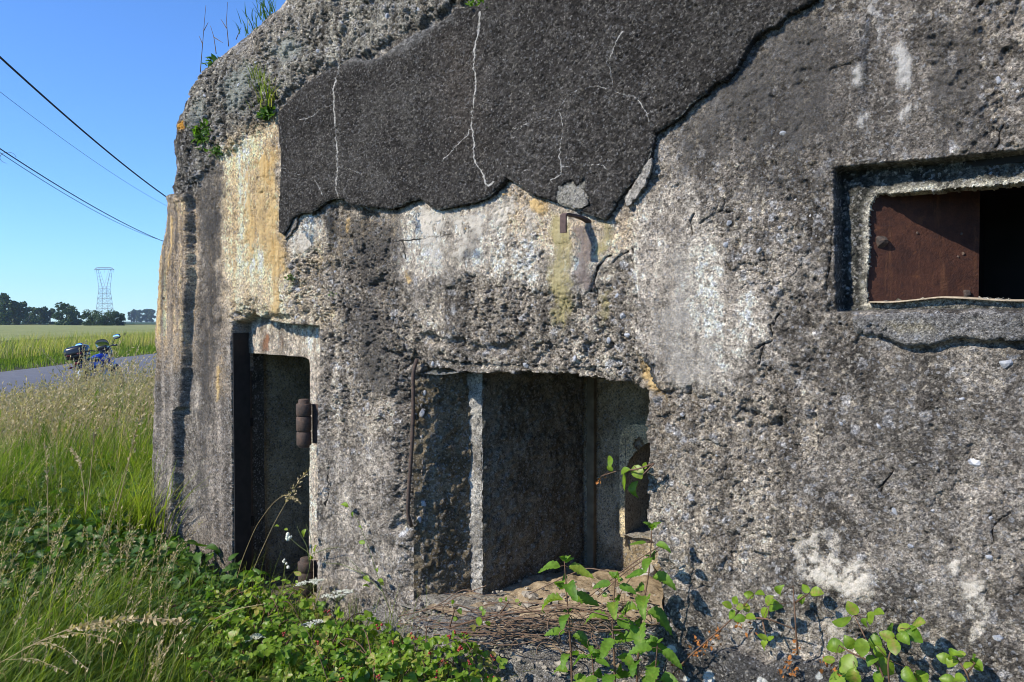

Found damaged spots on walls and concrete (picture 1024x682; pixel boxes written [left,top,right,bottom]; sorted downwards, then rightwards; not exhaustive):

crack [295,65,356,195]
crack [443,11,494,187]
crack [514,31,647,184]
rust [529,198,610,325]
spalling [235,164,877,638]